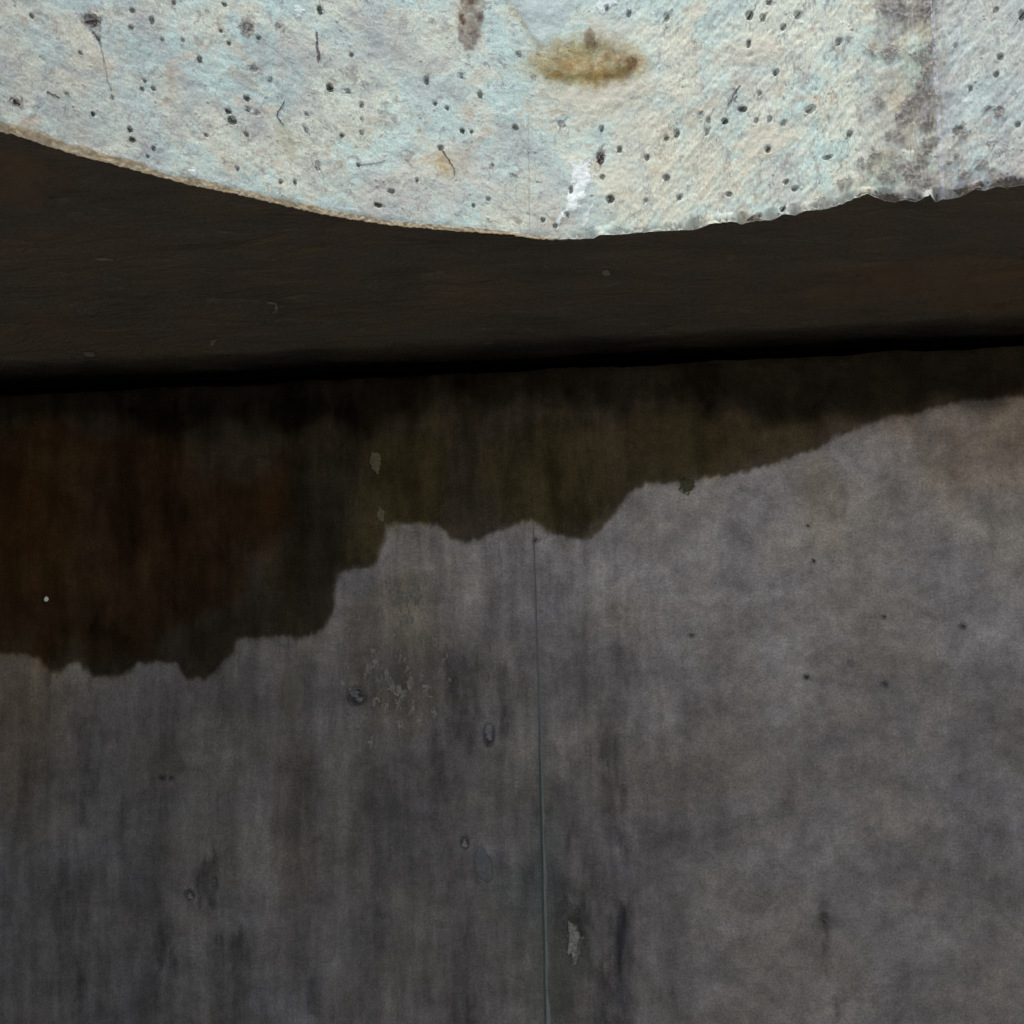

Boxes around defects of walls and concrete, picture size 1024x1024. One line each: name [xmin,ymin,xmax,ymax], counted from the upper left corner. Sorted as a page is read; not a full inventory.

leakage [0,343,1024,678]
spalling [562,920,585,968]